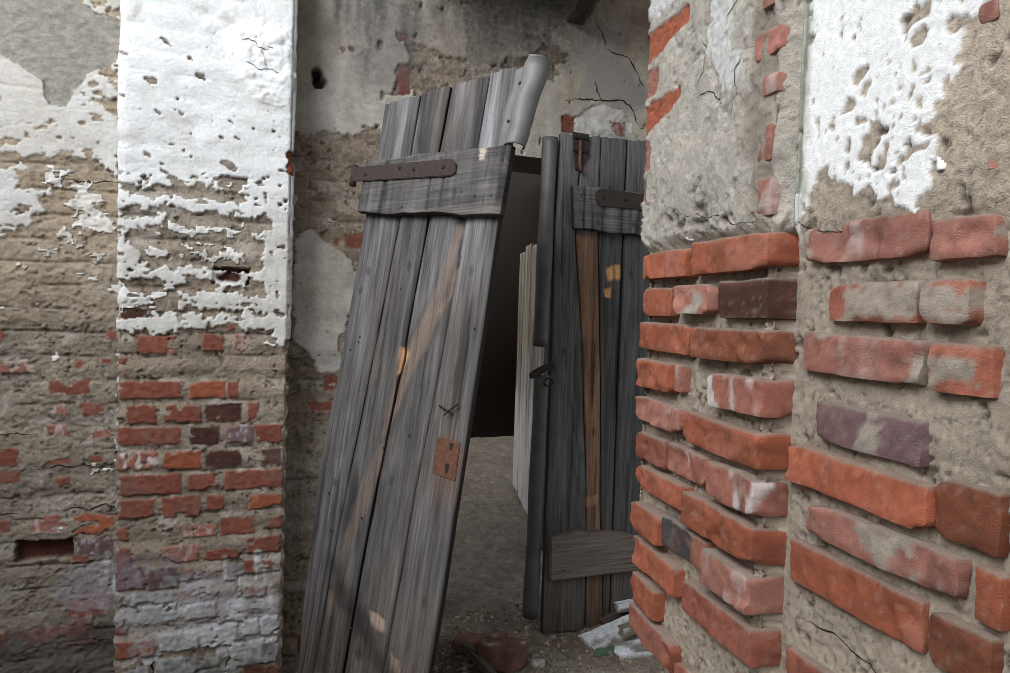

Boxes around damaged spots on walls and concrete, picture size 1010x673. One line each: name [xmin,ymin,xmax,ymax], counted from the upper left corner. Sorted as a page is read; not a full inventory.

flaking render [0,0,121,107]
flaking render [90,98,118,121]
spalling [311,67,328,91]
flaking render [393,33,567,96]
crack [565,24,646,129]
crack [697,41,753,115]
flaking render [574,0,905,257]
flaking render [901,0,1010,229]
flaking render [286,126,381,270]
flaking render [0,138,335,664]
crack [800,617,876,673]